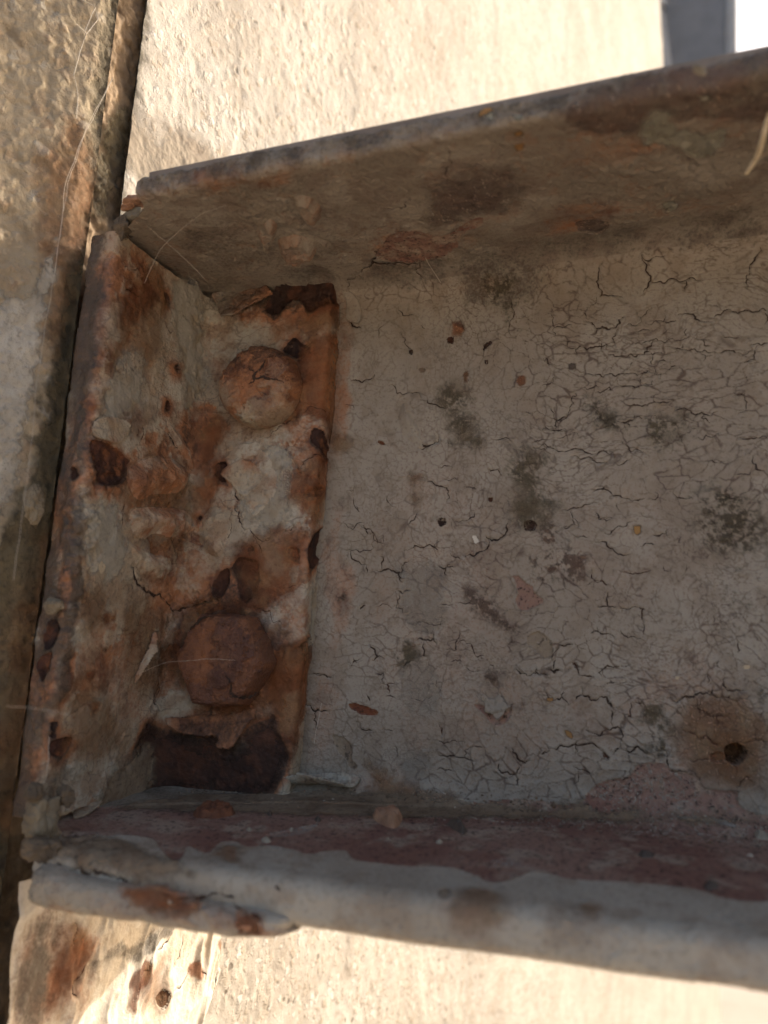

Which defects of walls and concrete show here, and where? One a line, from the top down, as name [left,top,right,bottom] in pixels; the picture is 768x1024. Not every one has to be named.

crack [347,248,423,287]
rust [285,303,340,443]
rust [285,456,328,521]
crack [313,255,768,784]
mould [703,492,768,552]
rust [236,527,301,608]
rust [267,637,310,745]
peeling [57,762,768,902]
rust [128,885,198,914]
rust [54,926,91,995]